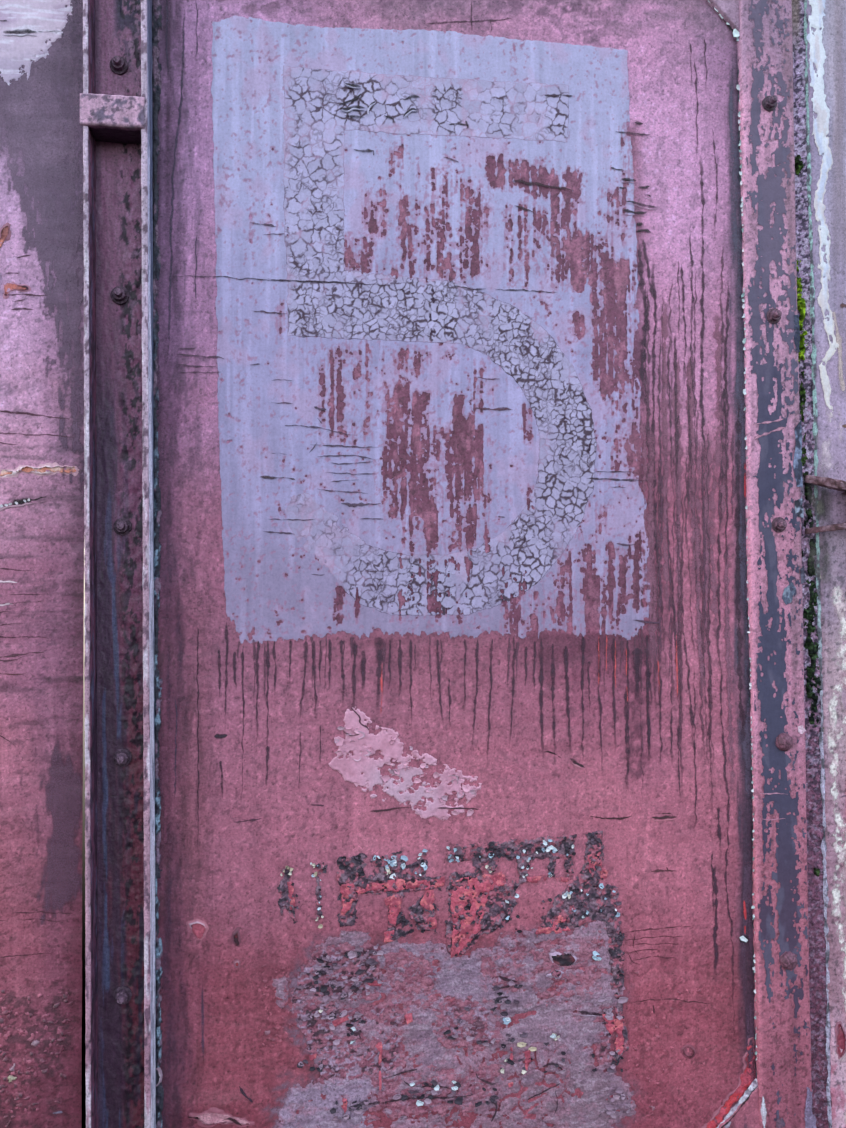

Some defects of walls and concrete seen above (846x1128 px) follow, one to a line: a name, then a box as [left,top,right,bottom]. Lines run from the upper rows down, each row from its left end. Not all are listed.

water stain [690,39,708,146]
peeling [0,222,11,248]
peeling [3,282,31,299]
crack [168,65,644,616]
water stain [507,132,746,975]
peeling [739,0,810,1078]
water stain [218,622,493,791]
peeling [328,707,482,821]
peeling [277,866,300,924]
peeling [296,830,629,1075]
peeling [392,1079,499,1107]
peeling [771,1063,816,1128]